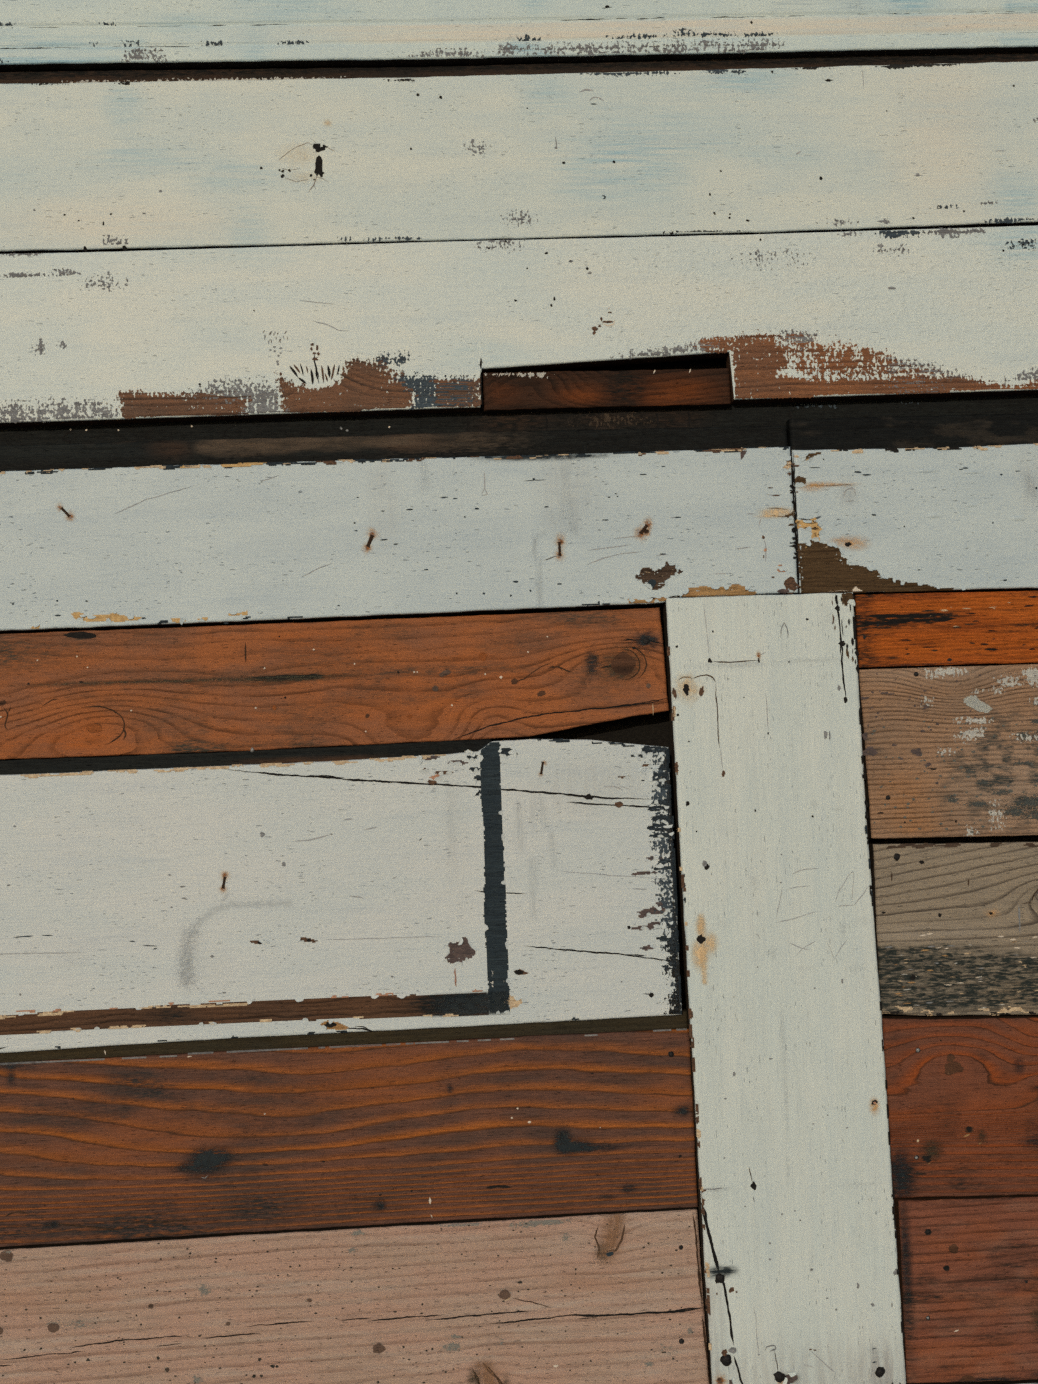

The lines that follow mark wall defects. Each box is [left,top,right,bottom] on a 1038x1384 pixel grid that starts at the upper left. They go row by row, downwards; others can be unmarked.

peeling [0,330,481,423]
peeling [610,326,1038,400]
peeling [694,446,966,673]
crack [228,769,658,809]
peeling [592,741,696,1072]
peeling [438,937,479,968]
spalling [704,1262,737,1315]